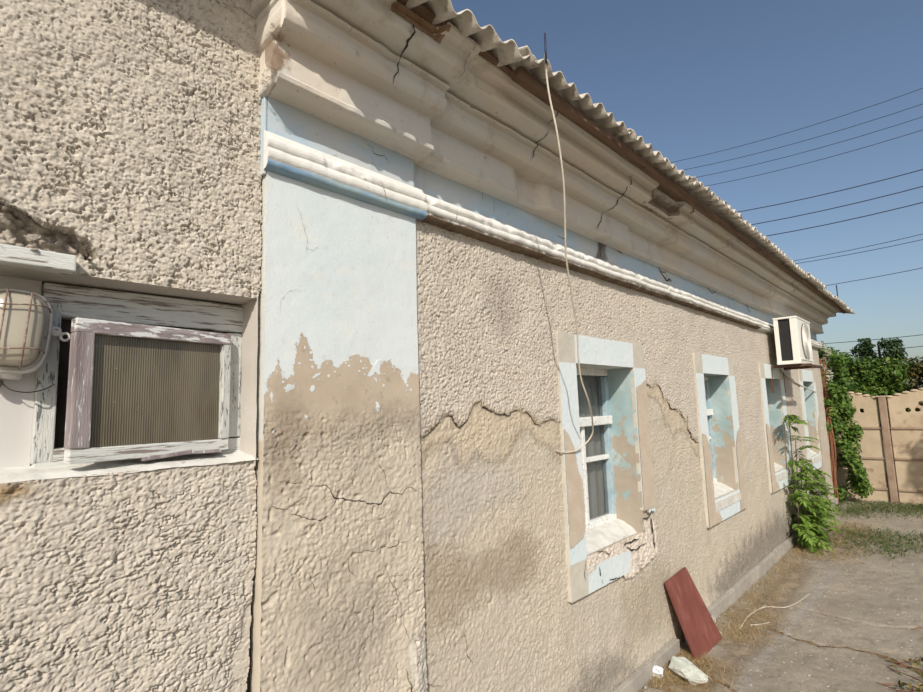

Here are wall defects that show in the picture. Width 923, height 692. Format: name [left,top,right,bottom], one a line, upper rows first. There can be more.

crack [392,14,416,85]
spalling [0,197,94,261]
spalling [646,383,722,528]
crack [272,467,417,521]
peeling [260,332,586,692]
spalling [586,510,658,579]
crack [768,628,923,674]